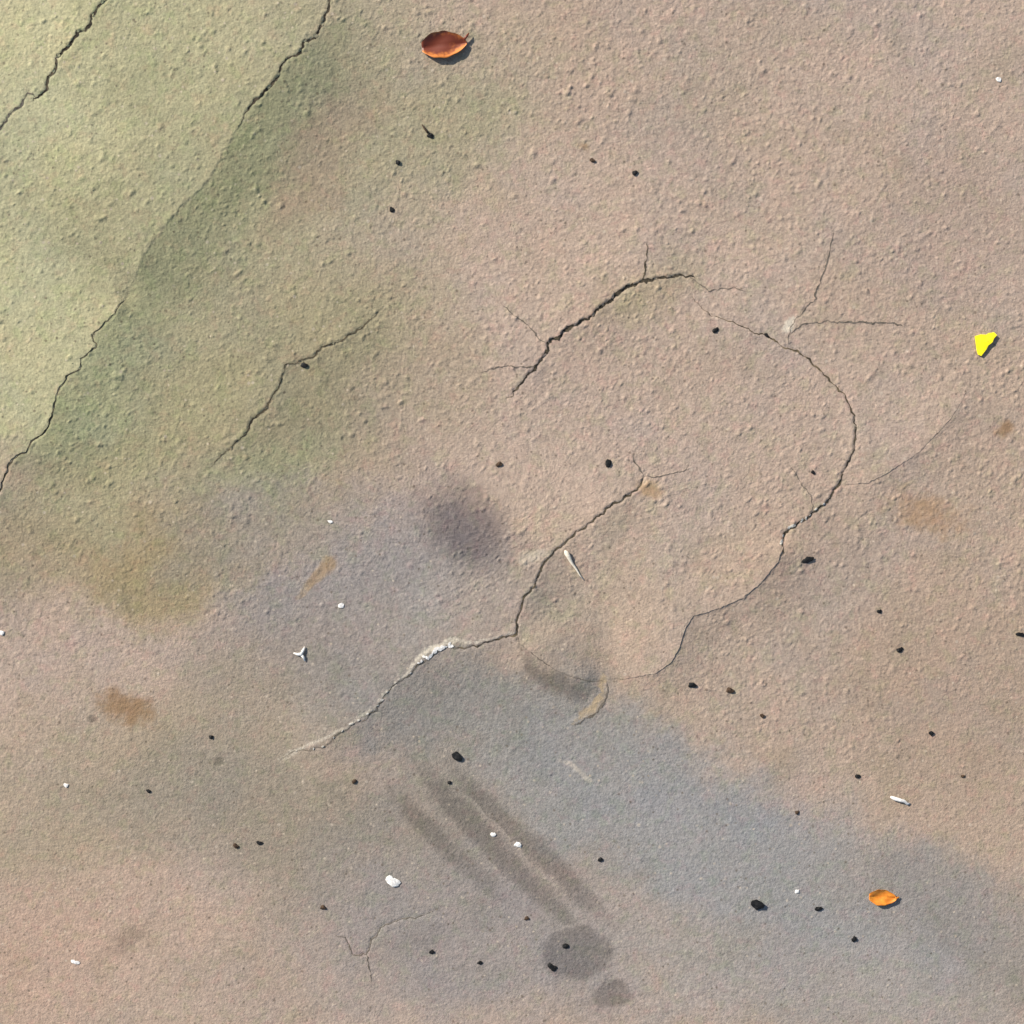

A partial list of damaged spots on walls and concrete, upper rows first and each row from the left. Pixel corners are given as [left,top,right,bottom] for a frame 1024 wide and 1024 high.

crack [0,0,106,129]
crack [237,0,330,130]
crack [0,296,125,491]
crack [211,314,377,467]
crack [481,229,906,556]
damp [381,450,555,604]
crack [286,454,689,756]
corrosion [79,675,175,738]
damp [275,629,516,766]
damp [379,742,641,1013]